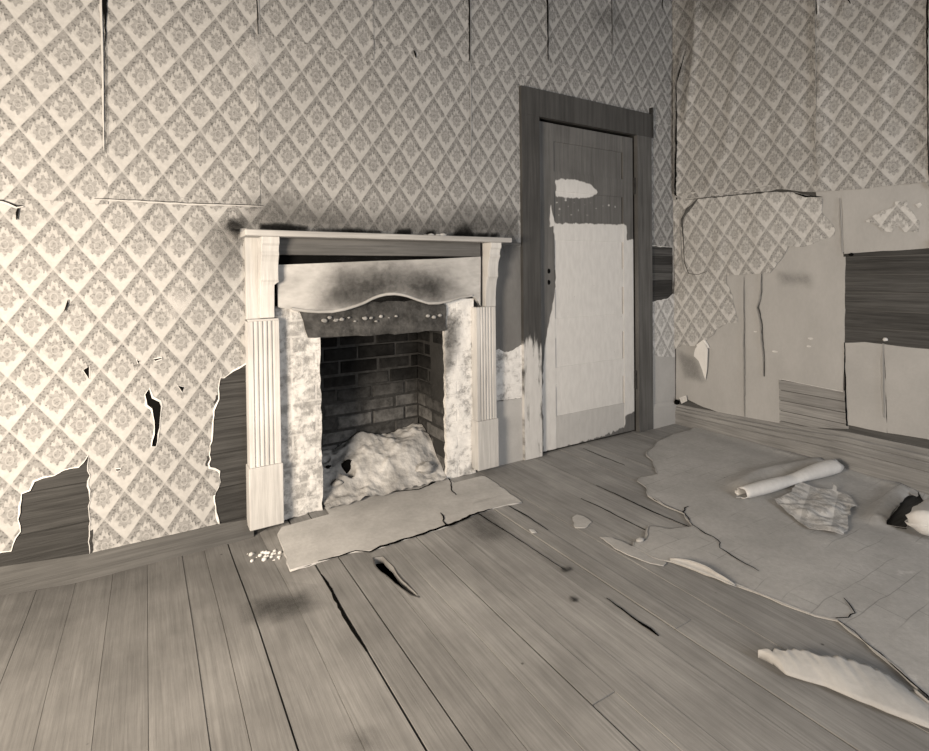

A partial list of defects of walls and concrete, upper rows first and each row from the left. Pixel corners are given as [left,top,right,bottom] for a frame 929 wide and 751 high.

crack [99,0,107,149]
crack [254,0,262,30]
crack [465,0,473,61]
peeling [843,248,929,349]
peeling [202,363,247,524]
peeling [779,379,849,429]
peeling [0,456,93,566]
crack [305,478,497,567]
crack [653,498,759,571]